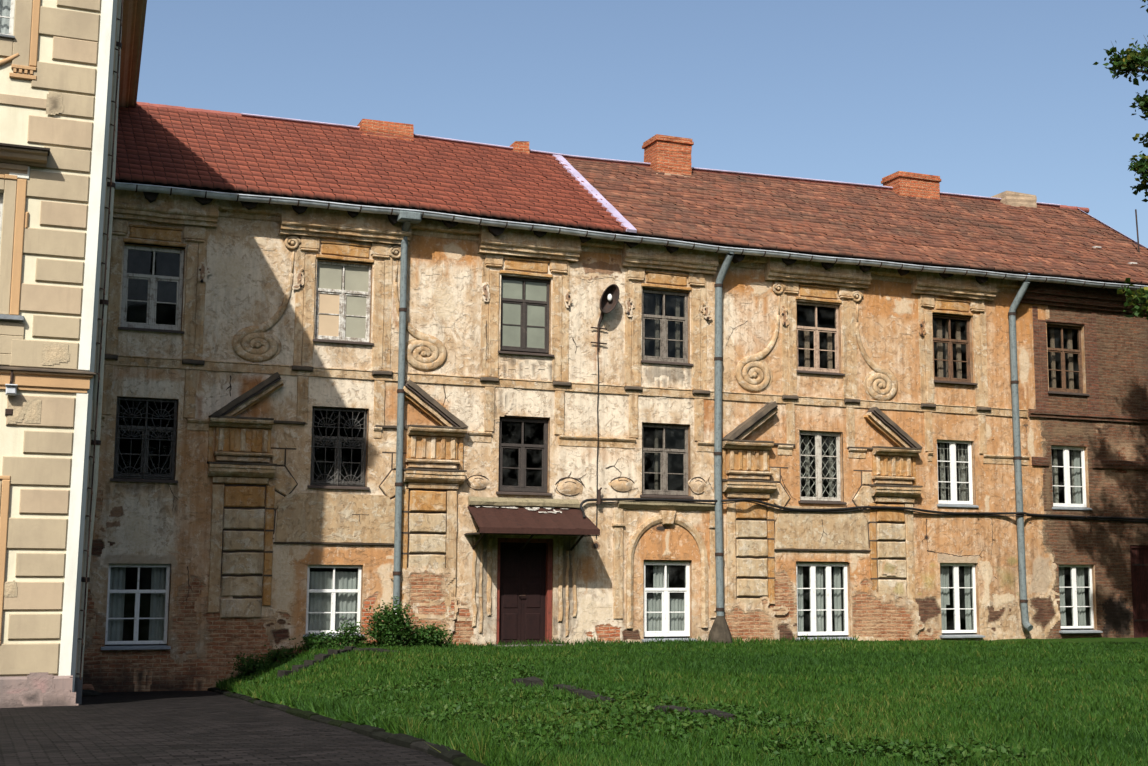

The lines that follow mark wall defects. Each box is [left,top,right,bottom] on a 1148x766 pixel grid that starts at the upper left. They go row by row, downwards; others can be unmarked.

flaking render [922,305,1145,639]
peeling [90,482,184,570]
flaking render [84,533,316,693]
flaking render [355,553,495,646]
flaking render [714,564,797,643]
flaking render [848,551,944,641]